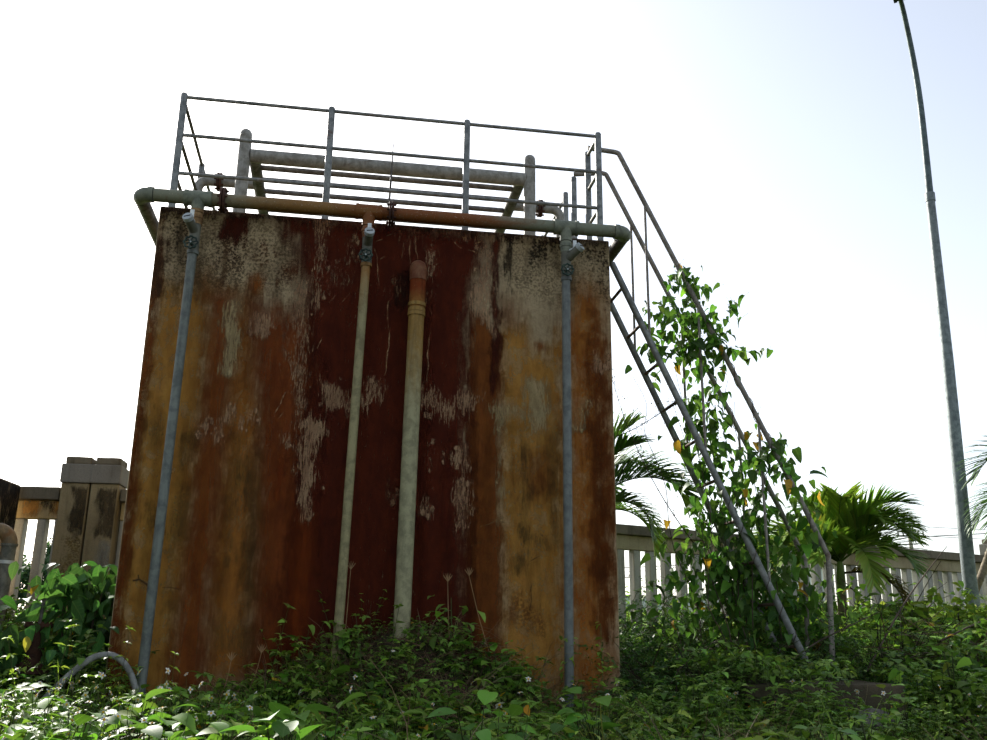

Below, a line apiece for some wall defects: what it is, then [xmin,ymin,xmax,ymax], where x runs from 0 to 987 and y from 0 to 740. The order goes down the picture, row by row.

peeling [217,219,387,522]
peeling [420,379,476,424]
damp [0,479,21,530]
damp [59,486,117,576]
rust [105,214,617,706]
peeling [442,442,475,532]